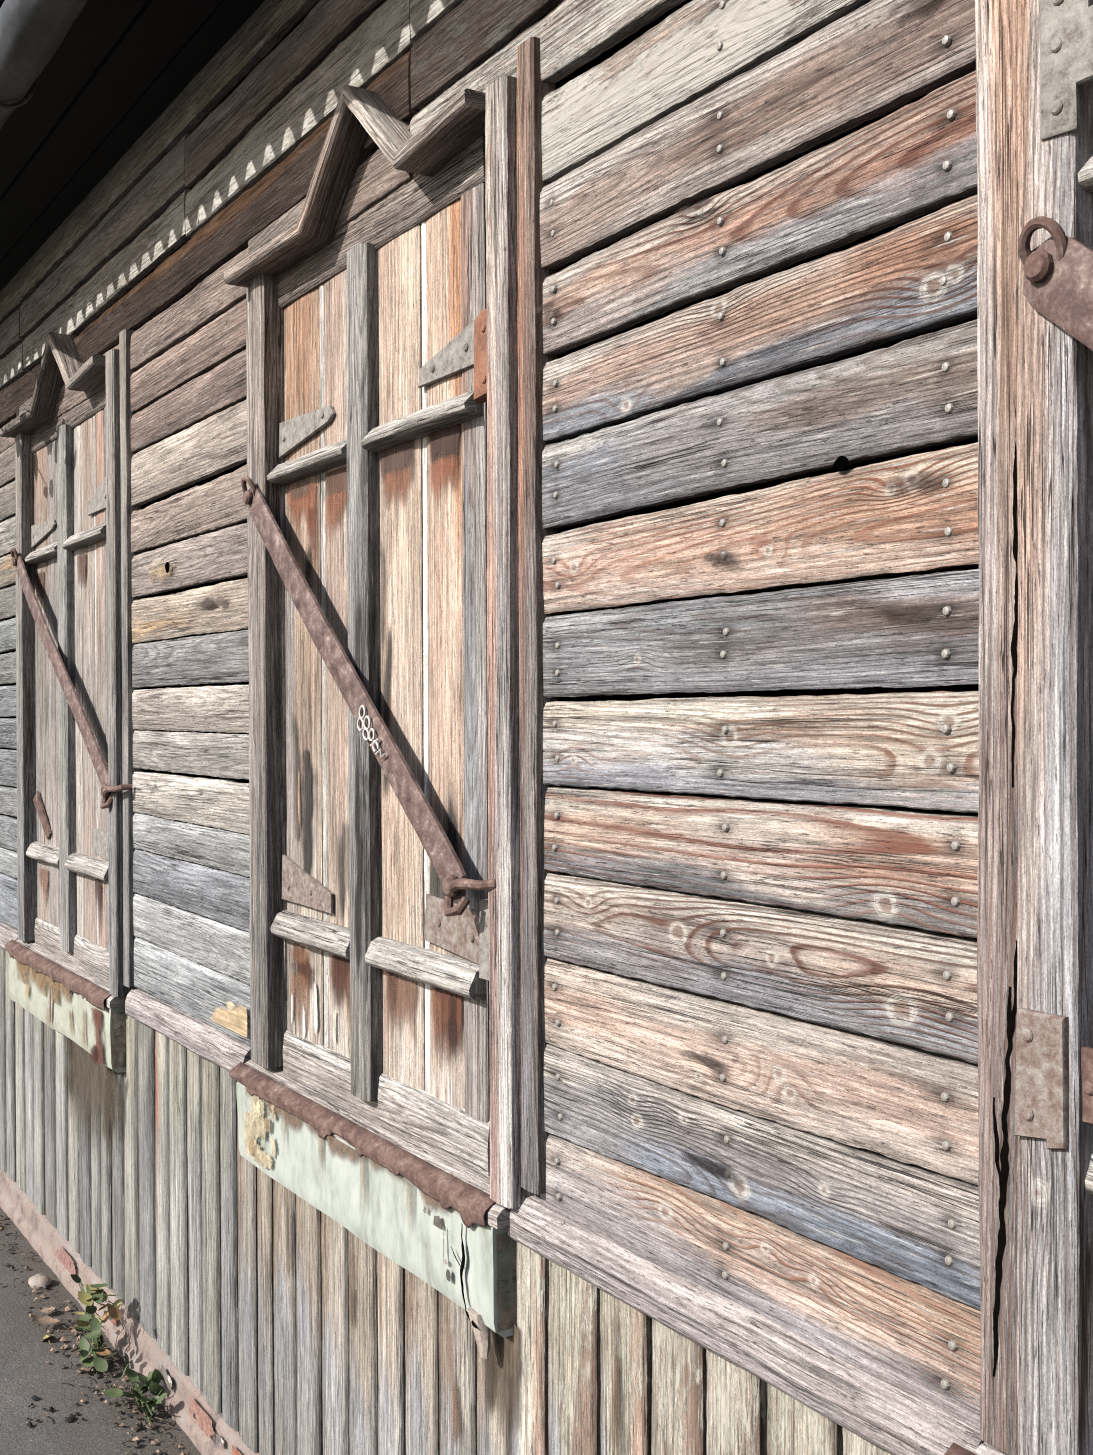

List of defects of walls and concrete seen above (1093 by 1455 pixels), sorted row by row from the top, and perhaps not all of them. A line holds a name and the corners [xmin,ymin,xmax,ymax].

rust [289,466,347,555]
rust [35,571,44,596]
rust [77,553,86,583]
crack [1010,408,1018,787]
rust [265,1101,405,1180]
crack [993,940,1017,1377]
peeling [423,1207,451,1282]
crack [451,1225,477,1329]
spalling [468,1307,491,1359]